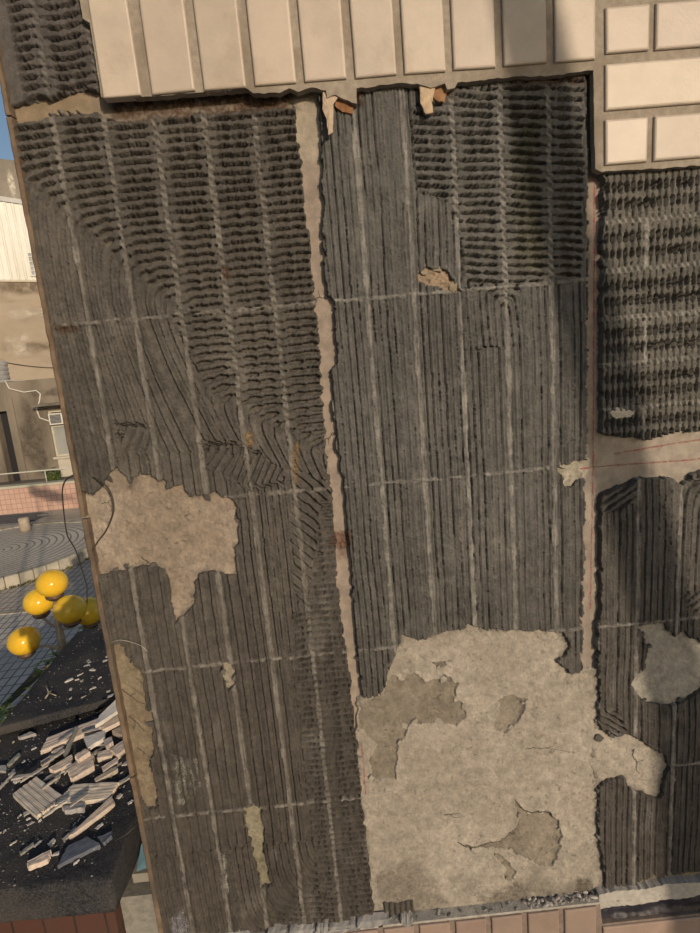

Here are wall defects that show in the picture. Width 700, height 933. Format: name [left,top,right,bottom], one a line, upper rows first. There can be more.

peeling [322,92,354,136]
peeling [419,86,447,115]
spalling [418,263,461,293]
peeling [610,407,636,419]
spalling [558,457,590,486]
spalling [84,468,240,621]
spalling [220,662,235,689]
spalling [631,623,700,704]
spalling [65,644,157,807]
spalling [355,624,667,912]
spalling [243,803,272,885]